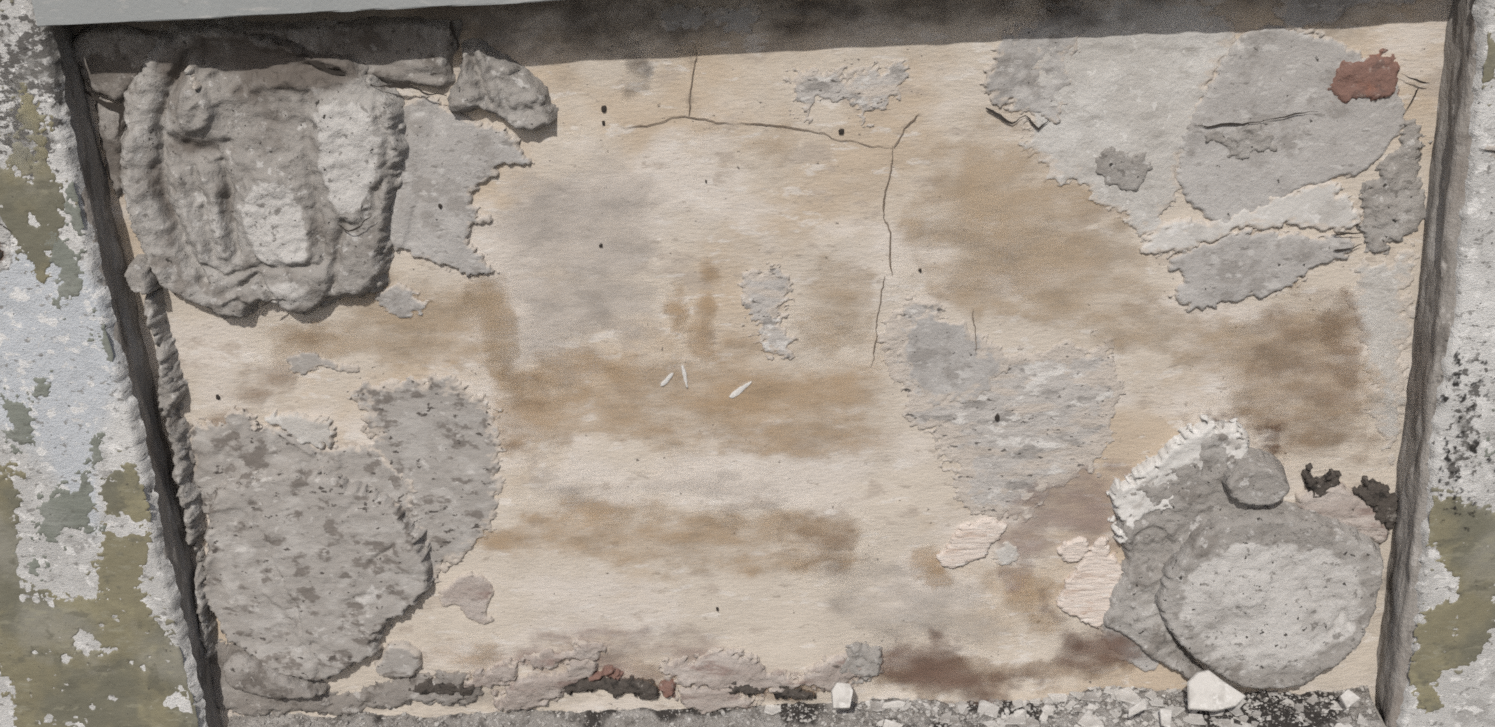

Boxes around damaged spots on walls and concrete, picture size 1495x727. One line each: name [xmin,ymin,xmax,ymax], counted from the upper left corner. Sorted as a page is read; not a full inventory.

spalling [447,38,559,131]
flaking render [1327,48,1400,103]
peeling [0,82,95,320]
crack [621,51,918,366]
peeling [87,309,113,362]
spalling [124,254,218,660]
spalling [1295,463,1399,543]
peeling [0,370,198,727]
peeling [438,571,495,625]
flaking render [374,624,906,714]
flaking render [1128,699,1147,717]
flaking render [1187,670,1246,712]